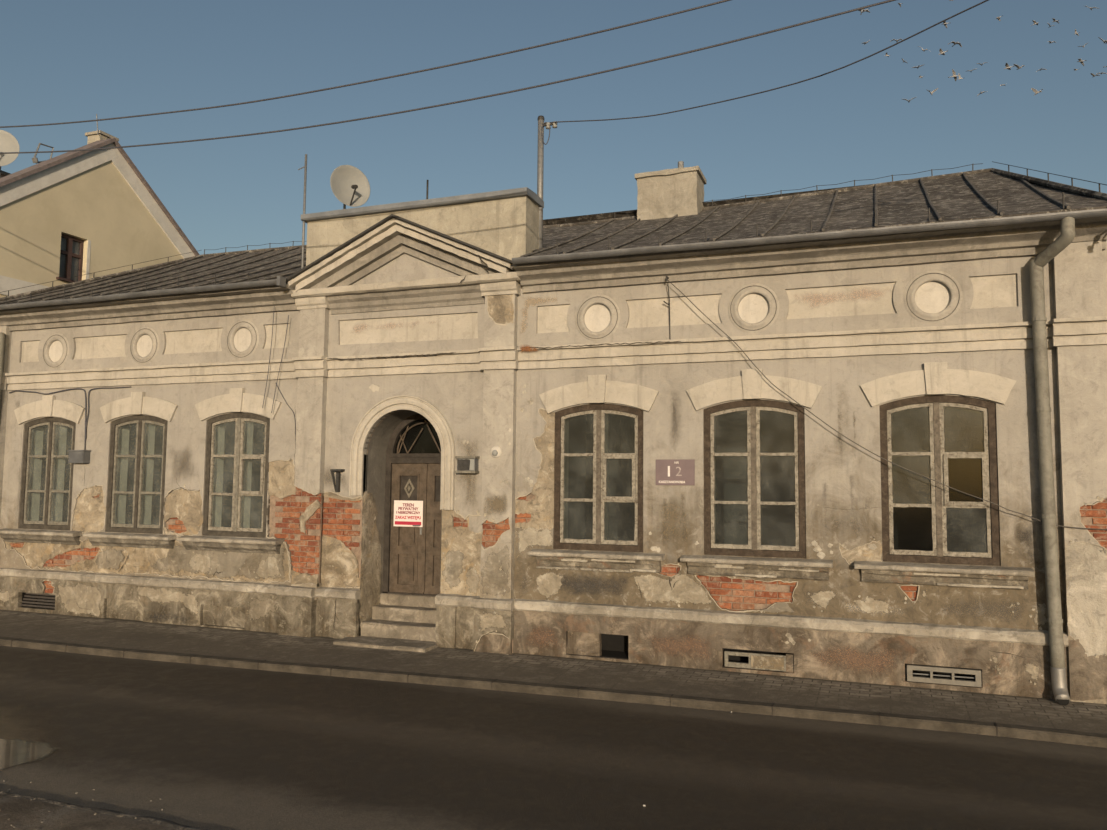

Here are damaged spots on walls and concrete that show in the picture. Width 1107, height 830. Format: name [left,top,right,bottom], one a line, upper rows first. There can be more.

flaking render [440,384,555,596]
flaking render [2,455,382,633]
flaking render [649,531,682,577]
flaking render [695,575,835,613]
flaking render [853,584,919,614]
flaking render [1064,496,1107,701]
flaking render [474,611,512,655]